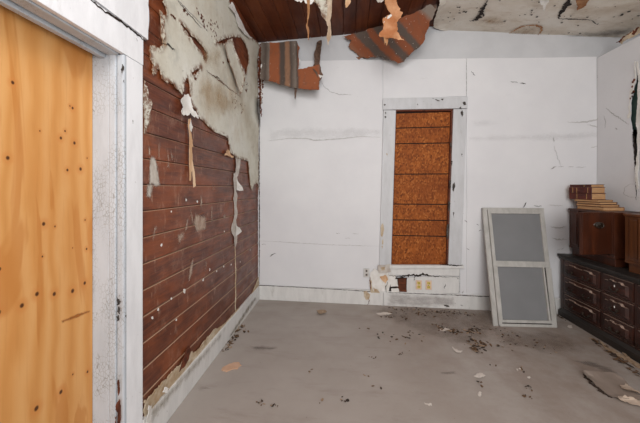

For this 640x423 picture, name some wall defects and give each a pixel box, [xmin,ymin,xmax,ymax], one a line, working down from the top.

crack [91,0,145,41]
peeling [159,10,176,41]
peeling [229,2,252,39]
peeling [222,39,247,95]
peeling [143,80,153,134]
peeling [181,94,199,132]
spalling [143,150,244,423]
spalling [369,264,407,293]